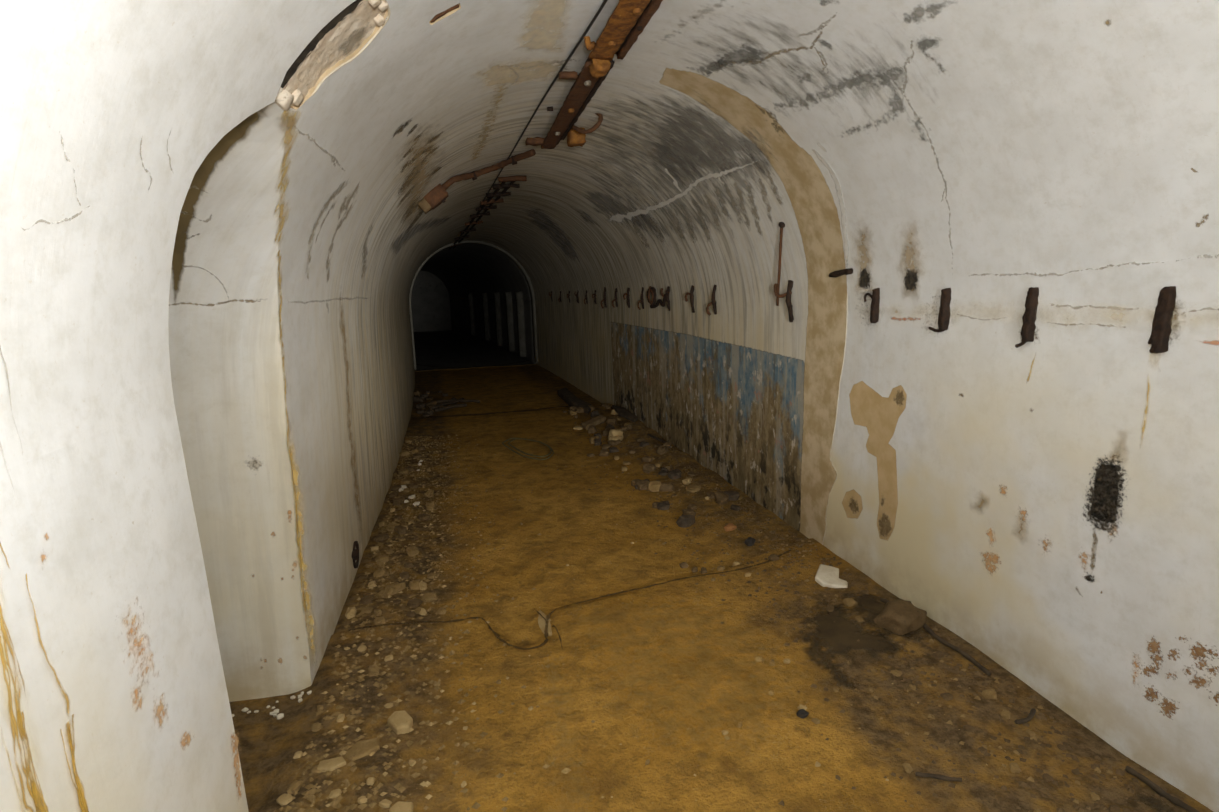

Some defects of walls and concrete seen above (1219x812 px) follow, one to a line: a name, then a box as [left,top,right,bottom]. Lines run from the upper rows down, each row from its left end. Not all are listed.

spalling [275,0,390,112]
damp [578,100,782,247]
crack [608,160,760,223]
damp [687,37,903,132]
crack [893,41,953,255]
damp [905,5,942,23]
damp [917,39,940,66]
peeling [842,489,863,519]
peeling [849,381,907,541]
spalling [1076,455,1125,595]
corrosion [0,606,48,812]
corrosion [26,574,88,812]